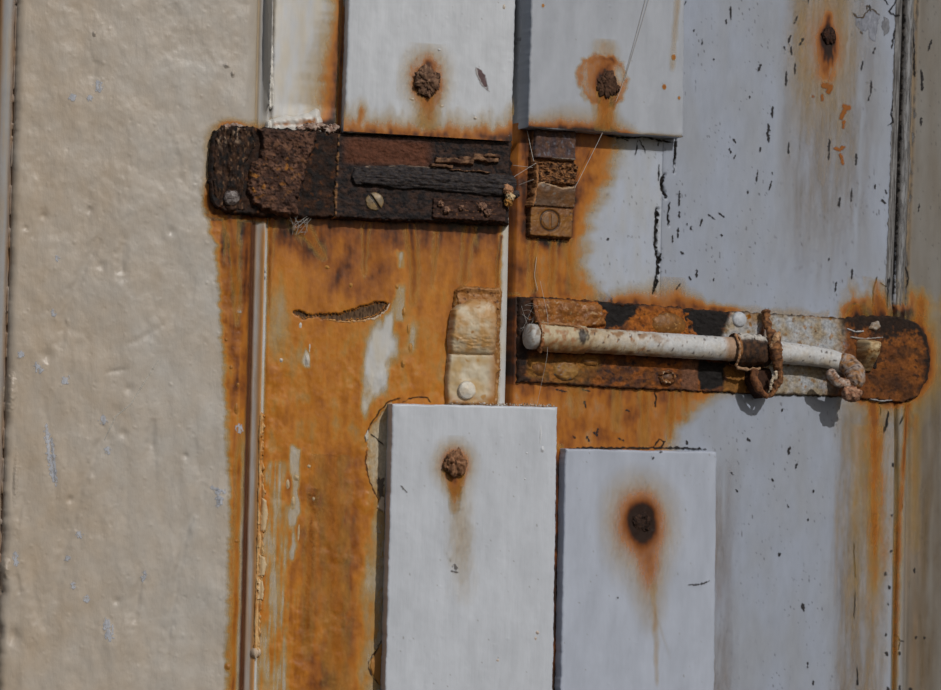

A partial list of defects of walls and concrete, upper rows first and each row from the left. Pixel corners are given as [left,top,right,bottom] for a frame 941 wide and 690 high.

corrosion [812,10,841,101]
corrosion [839,104,851,129]
peeling [853,0,918,306]
corrosion [203,0,743,690]
corrosion [840,284,938,658]